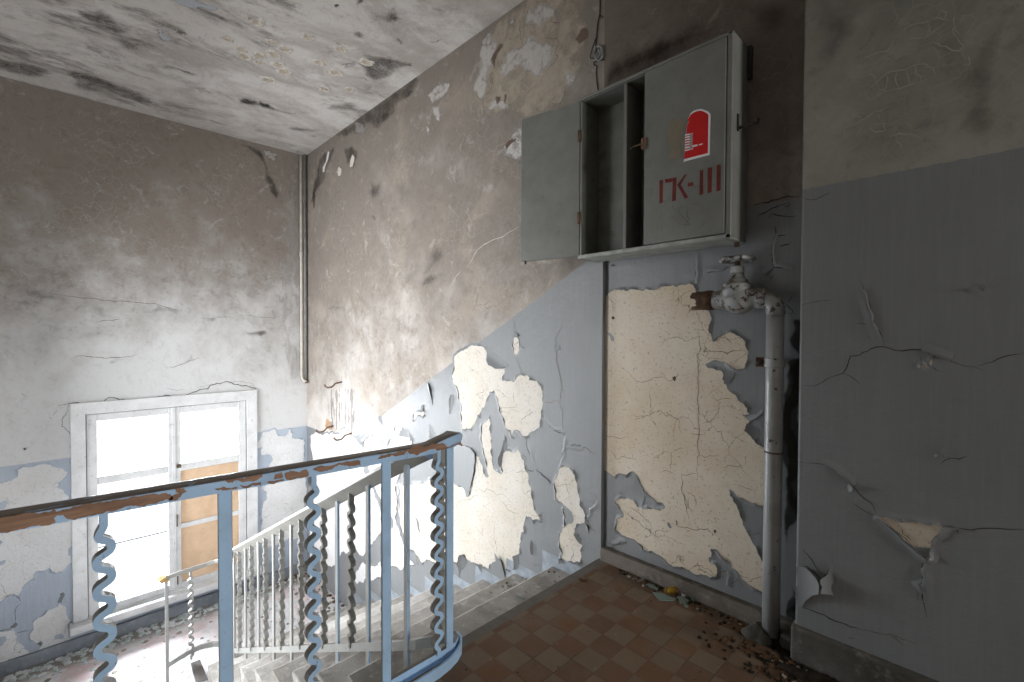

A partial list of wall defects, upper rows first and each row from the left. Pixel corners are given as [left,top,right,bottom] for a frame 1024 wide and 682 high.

leakage [0,60,47,76]
leakage [67,71,152,103]
leakage [344,79,416,135]
mould [364,55,410,79]
peeling [473,0,588,117]
peeling [215,319,546,586]
peeling [604,280,764,596]
peeling [0,461,187,604]
peeling [552,463,589,566]
spalling [870,510,959,565]
crack [950,525,1018,533]
peeling [0,603,73,663]